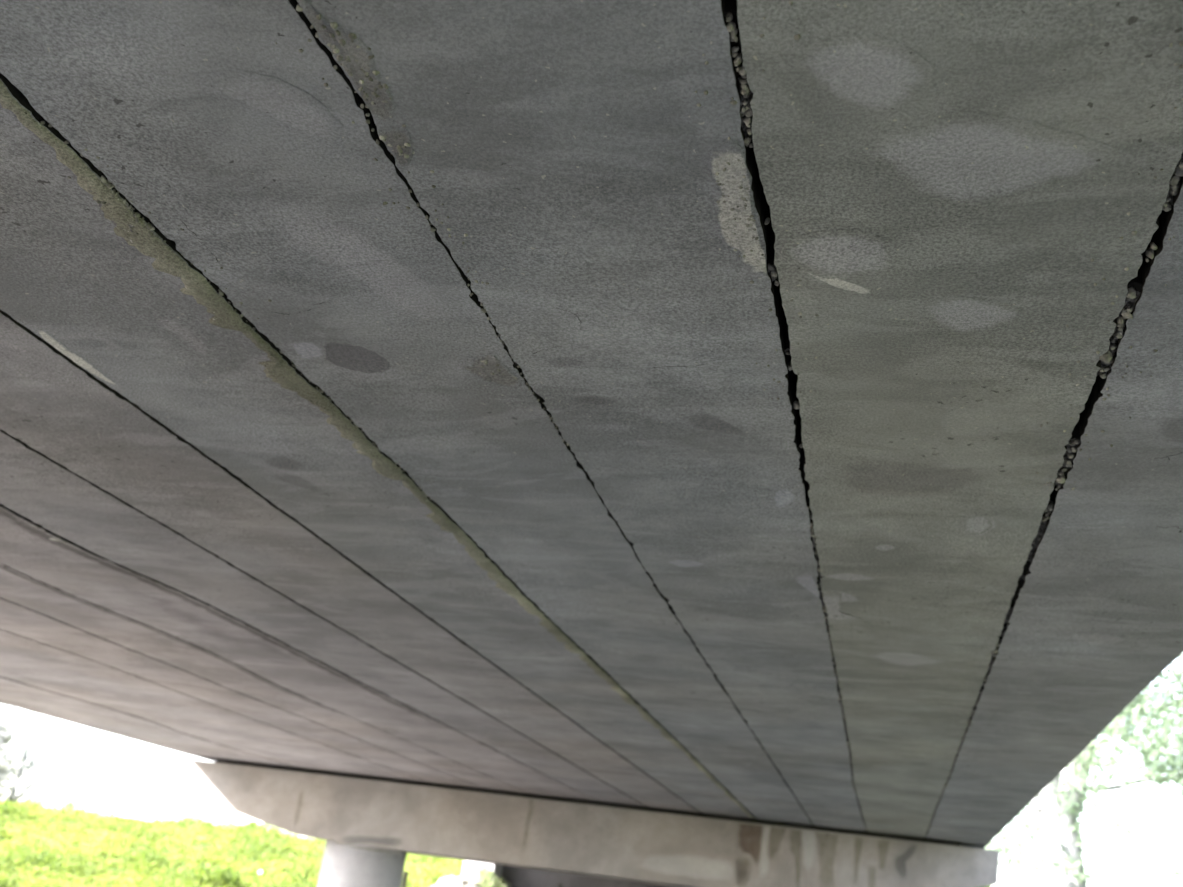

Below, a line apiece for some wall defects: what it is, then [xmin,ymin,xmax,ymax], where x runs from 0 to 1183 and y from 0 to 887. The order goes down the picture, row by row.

crack [0,0,813,852]
crack [695,0,867,831]
efflorescence [708,139,881,297]
crack [925,153,1183,839]
leakage [627,826,920,887]